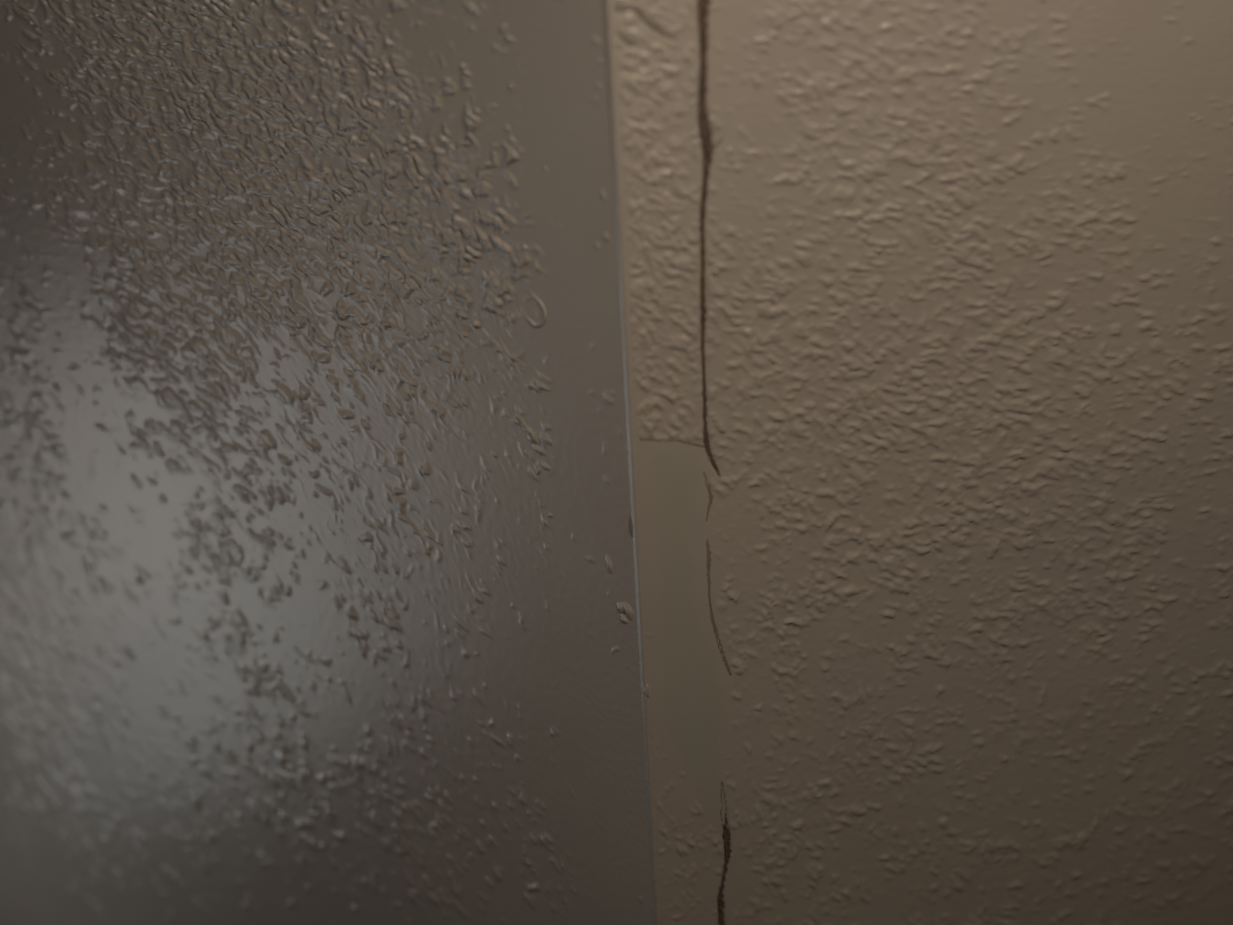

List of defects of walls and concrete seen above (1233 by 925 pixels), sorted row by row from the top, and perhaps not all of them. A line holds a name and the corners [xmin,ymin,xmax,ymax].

crack [717,781,732,925]